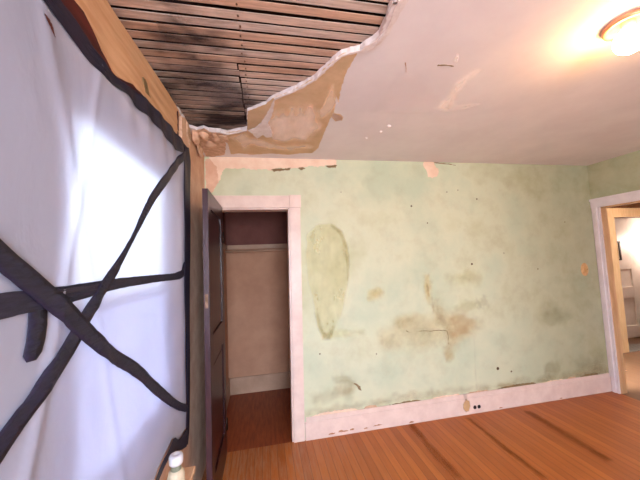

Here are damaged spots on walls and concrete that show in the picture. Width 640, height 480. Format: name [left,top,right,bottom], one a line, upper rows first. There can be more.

water stain [189,35,218,49]
water stain [163,53,254,128]
peeling [191,0,409,193]
peeling [423,162,456,178]